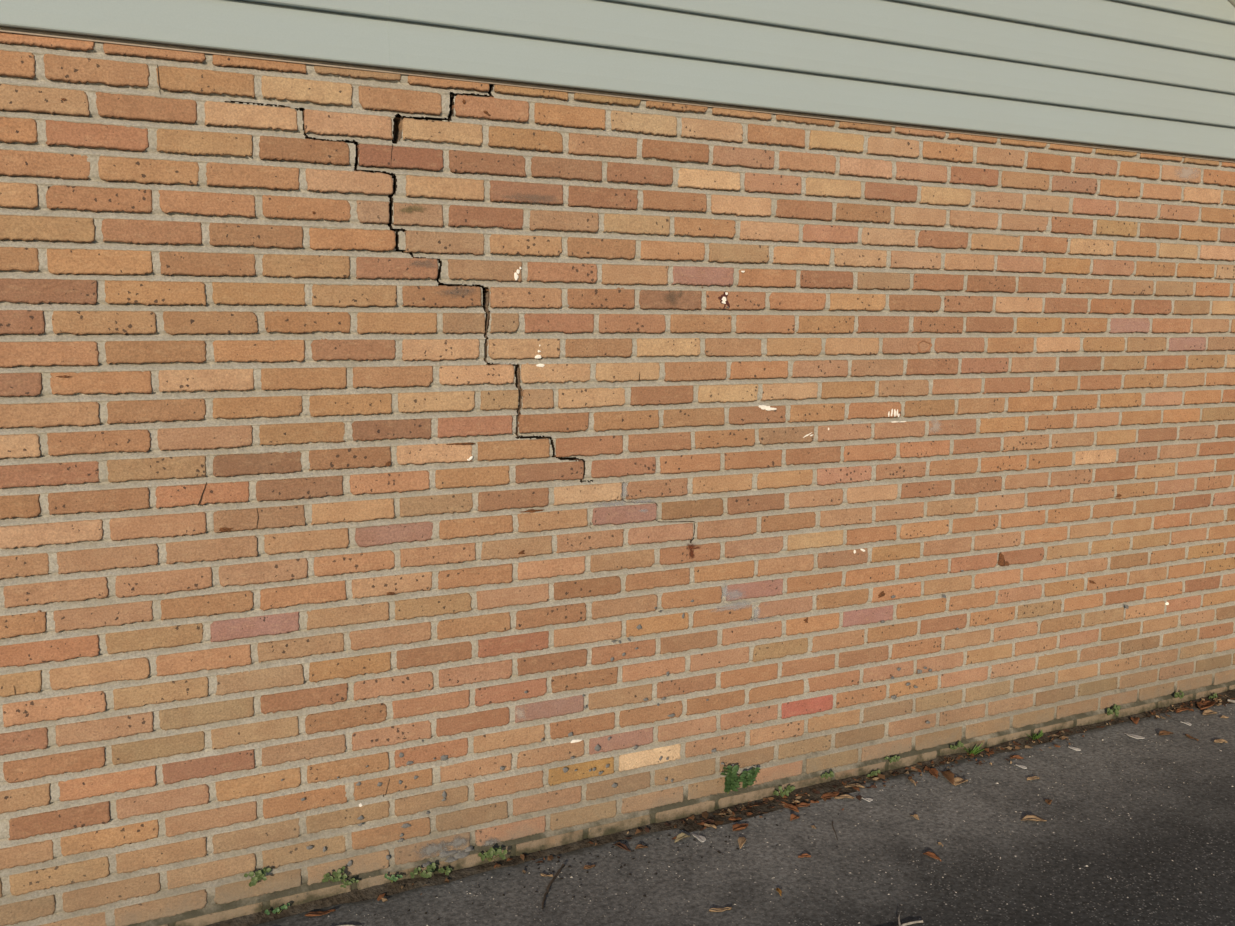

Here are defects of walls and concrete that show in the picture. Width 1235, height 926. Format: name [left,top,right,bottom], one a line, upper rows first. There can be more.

crack [225,84,593,482]
crack [622,482,695,543]